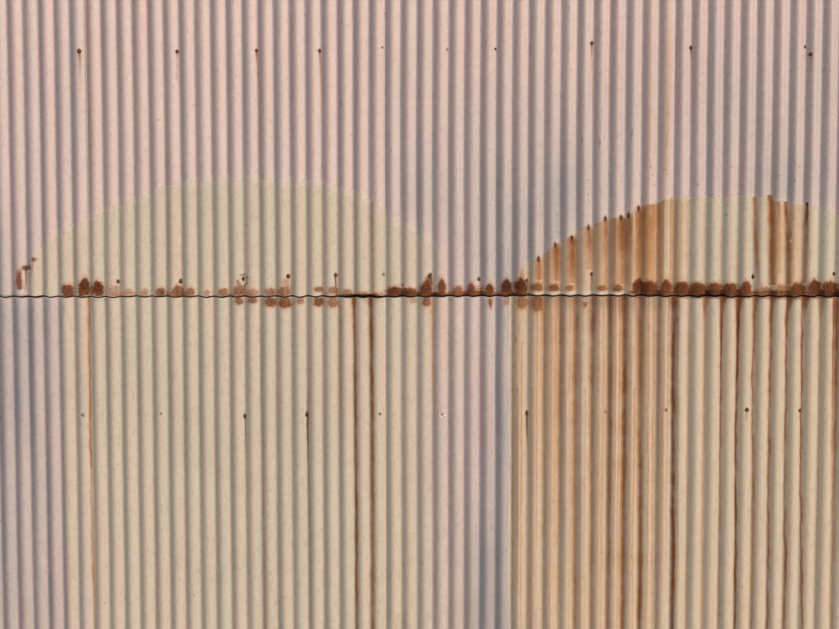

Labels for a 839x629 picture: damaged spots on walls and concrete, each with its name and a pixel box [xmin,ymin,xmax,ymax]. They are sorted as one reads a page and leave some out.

rust [16,258,35,290]
rust [156,285,194,296]
rust [219,274,303,308]
rust [387,242,577,312]
rust [313,277,378,511]
rust [597,195,839,629]